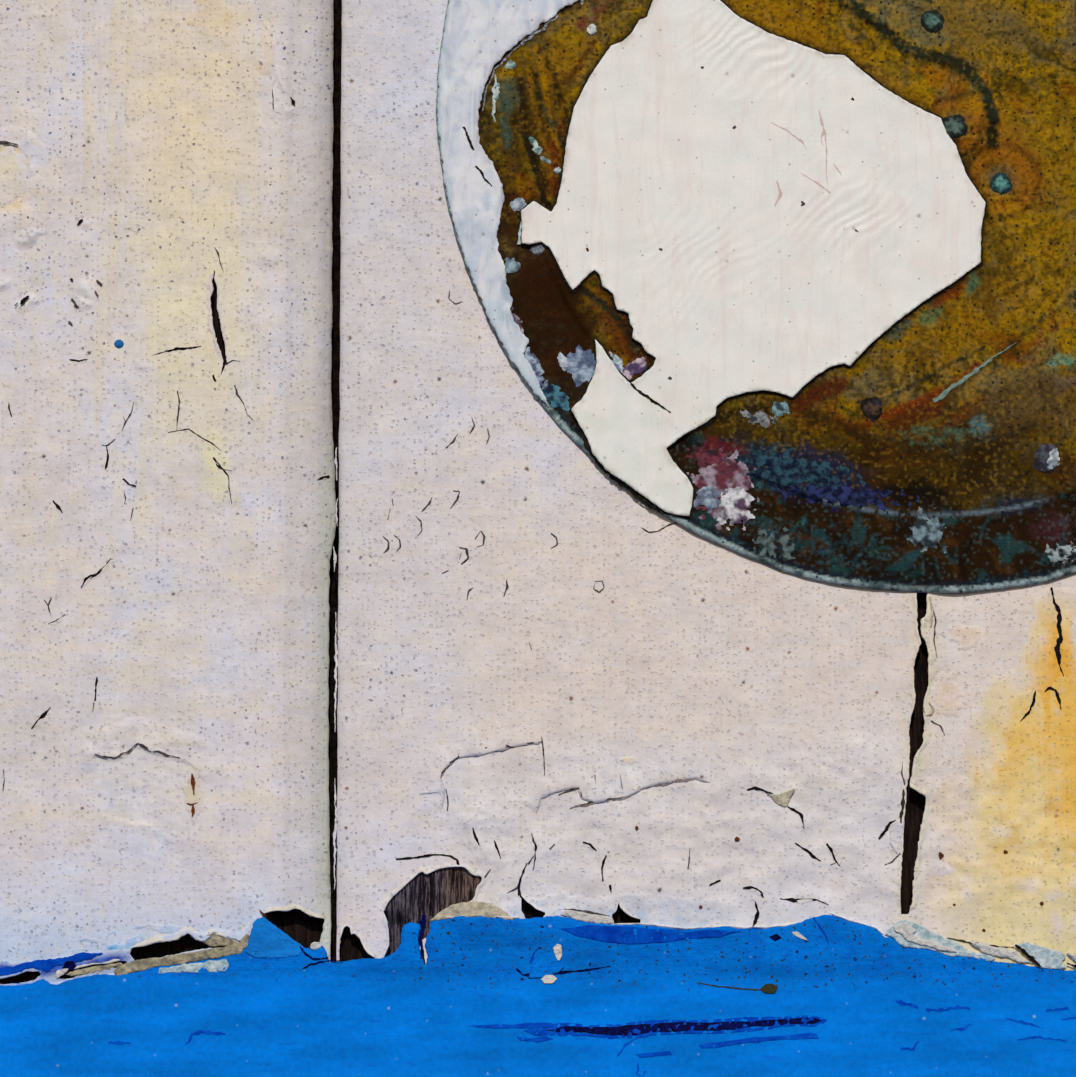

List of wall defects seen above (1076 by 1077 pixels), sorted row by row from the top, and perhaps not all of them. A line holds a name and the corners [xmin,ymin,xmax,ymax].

crack [154,247,254,421]
crack [168,391,232,504]
crack [1021,587,1064,721]
peeling [0,968,41,984]
peeling [56,716,712,979]
crack [582,842,612,892]
peeling [558,901,808,945]
crack [709,880,829,927]
crack [747,786,840,866]
crack [878,592,945,914]
peeling [828,912,1076,969]
rust [885,587,1076,971]